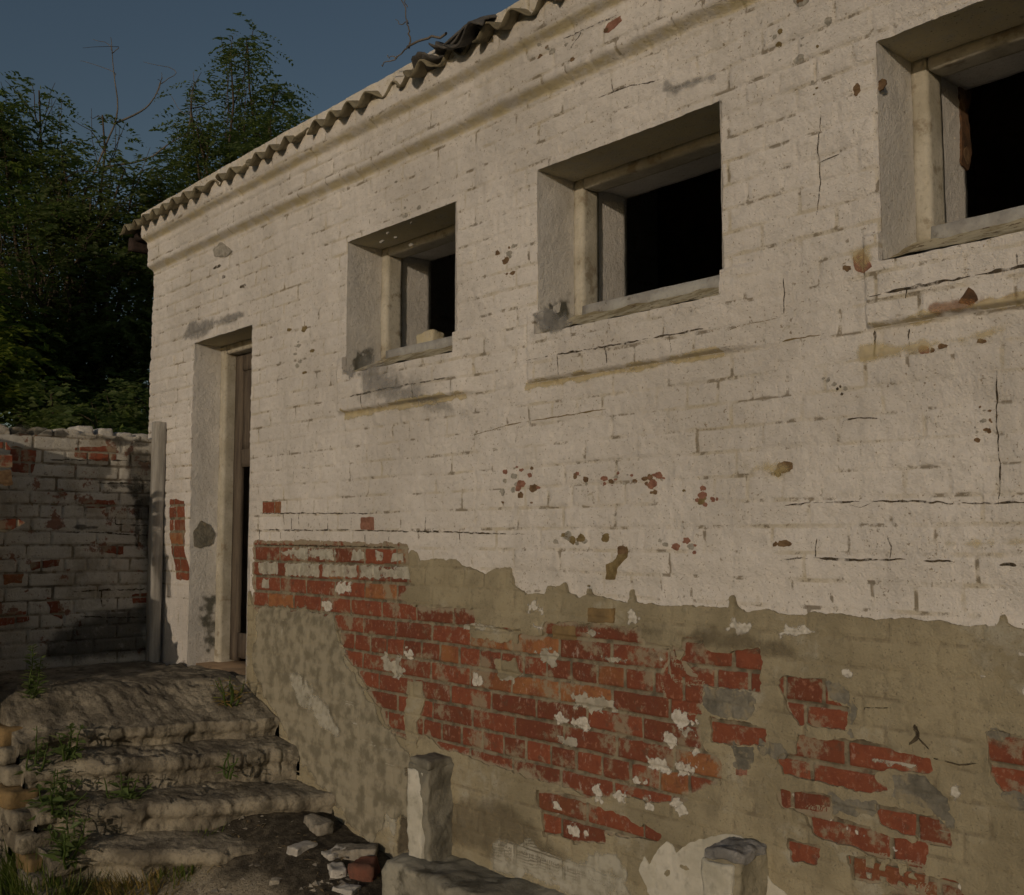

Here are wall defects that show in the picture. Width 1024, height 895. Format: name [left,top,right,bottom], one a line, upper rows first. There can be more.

crack [816,117,839,215]
crack [869,255,1024,298]
crack [785,379,1024,508]
leakage [109,451,151,555]
peeling [499,466,541,504]
peeling [573,471,665,495]
peeling [682,486,718,507]
flaking render [3,558,60,585]
flaking render [169,499,215,580]
crack [787,536,953,562]
crack [1000,560,1017,568]
peeling [246,517,1024,895]